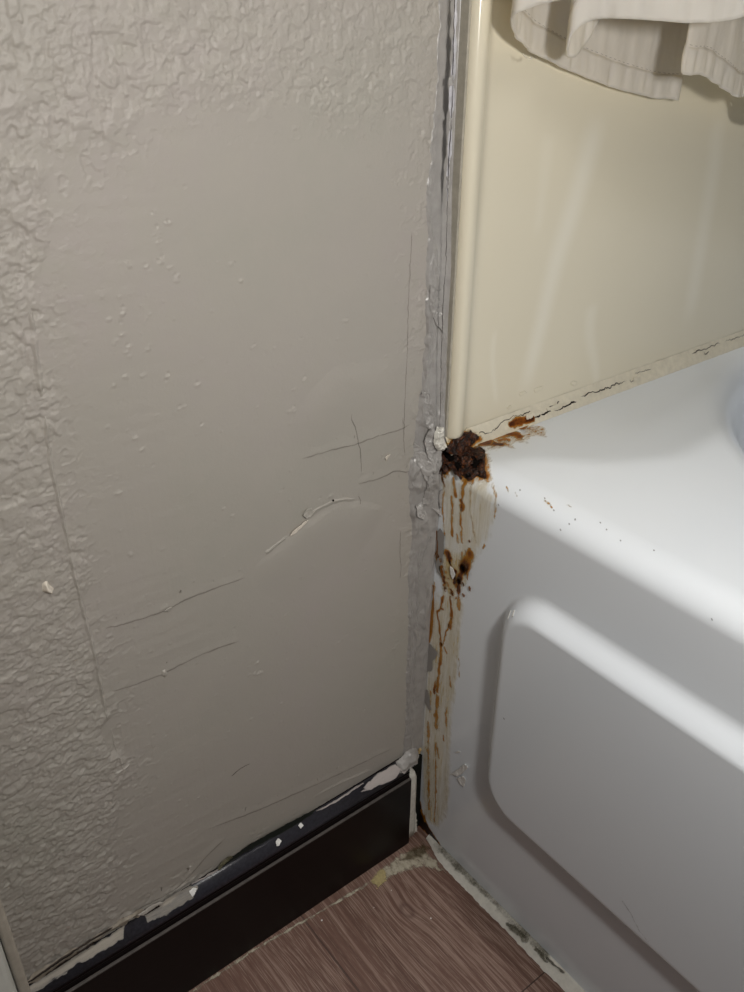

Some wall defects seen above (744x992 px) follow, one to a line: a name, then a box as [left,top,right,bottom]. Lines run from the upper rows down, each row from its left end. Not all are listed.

crack [440,232,448,354]
rust [477,416,543,448]
rust [419,473,485,845]
peeling [28,902,163,984]